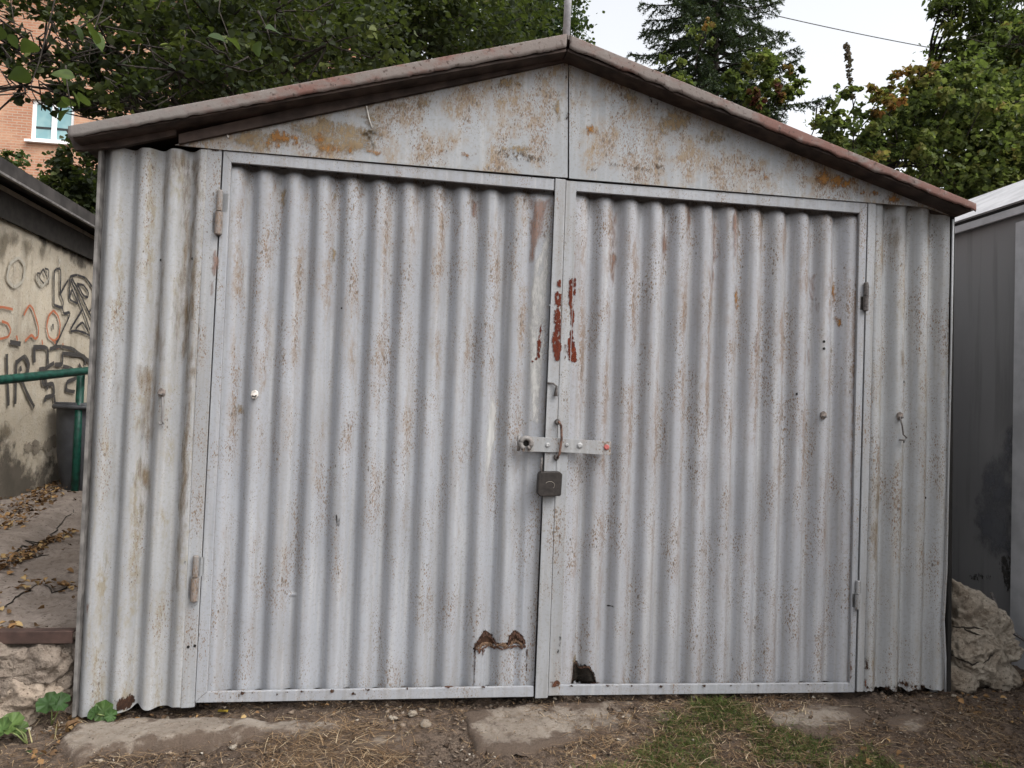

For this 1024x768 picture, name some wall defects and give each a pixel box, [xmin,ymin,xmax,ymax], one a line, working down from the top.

rust [234,114,384,155]
rust [816,168,899,202]
rust [115,693,135,712]